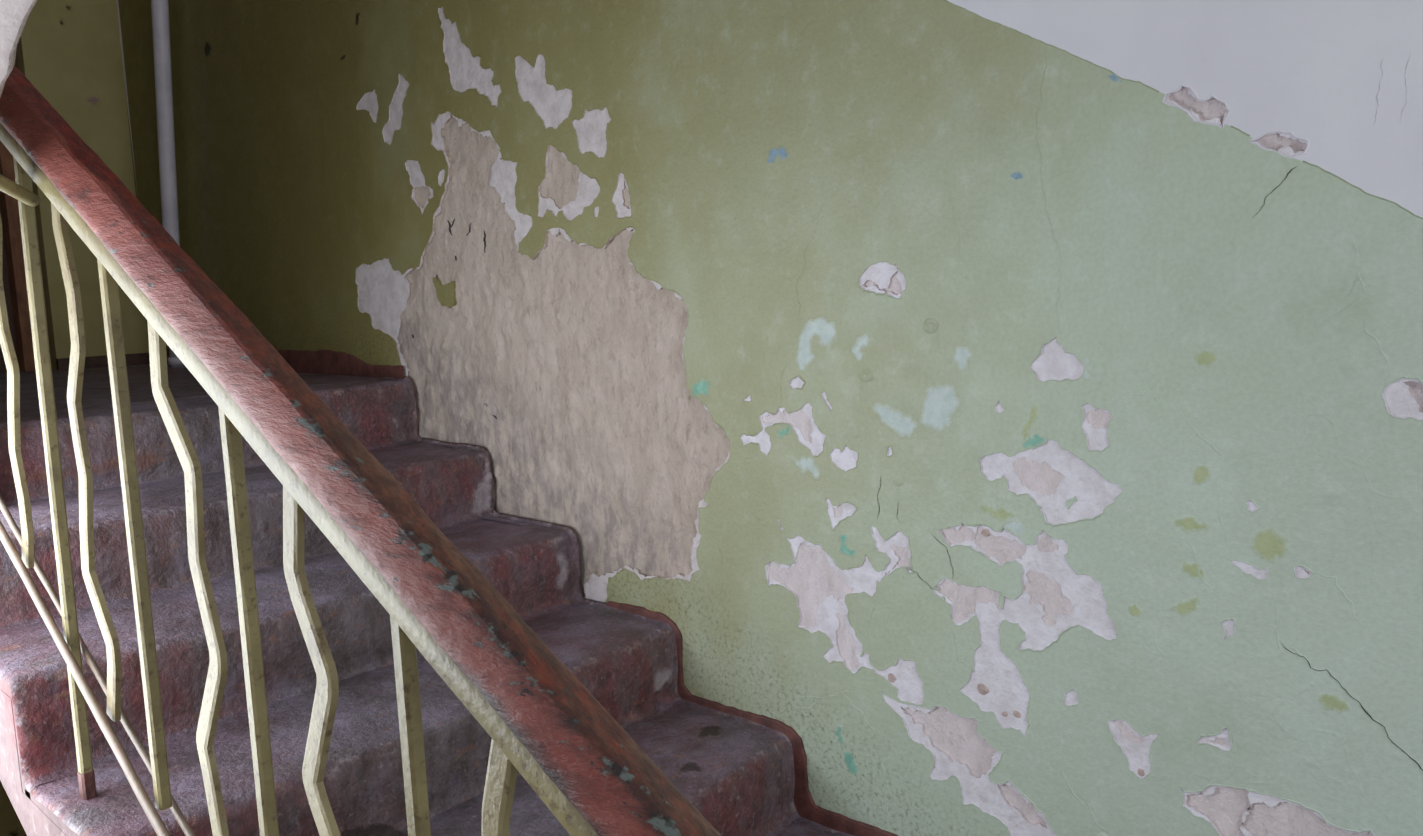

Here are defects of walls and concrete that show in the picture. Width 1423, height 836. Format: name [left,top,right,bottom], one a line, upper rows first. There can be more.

spalling [1162,84,1230,128]
spalling [1250,130,1310,158]
spalling [355,6,870,602]
peeling [858,261,907,300]
peeling [1029,336,1085,383]
peeling [870,344,974,457]
peeling [1380,375,1423,422]
peeling [764,400,1123,836]
peeling [651,667,674,694]
crack [1280,640,1423,771]
peeling [1106,717,1160,780]
spalling [1179,784,1375,836]